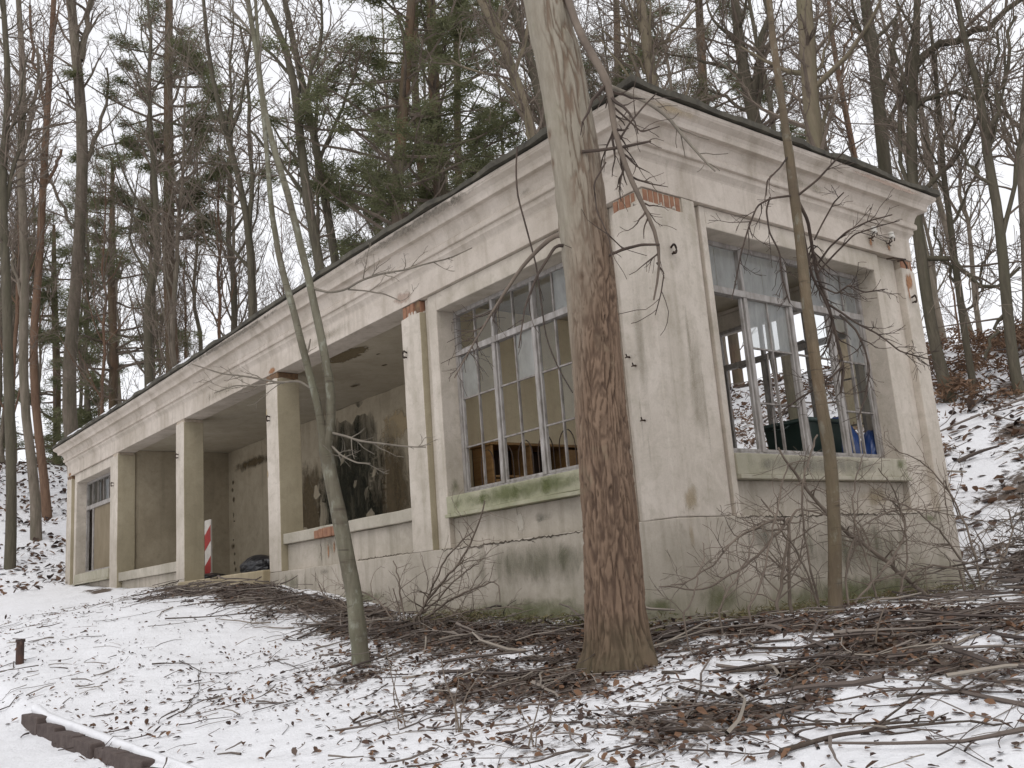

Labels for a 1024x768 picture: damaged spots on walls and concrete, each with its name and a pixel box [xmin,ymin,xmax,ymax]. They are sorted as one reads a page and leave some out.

spalling [613,188,695,215]
spalling [403,300,426,320]
spalling [321,347,368,363]
crack [442,509,582,552]